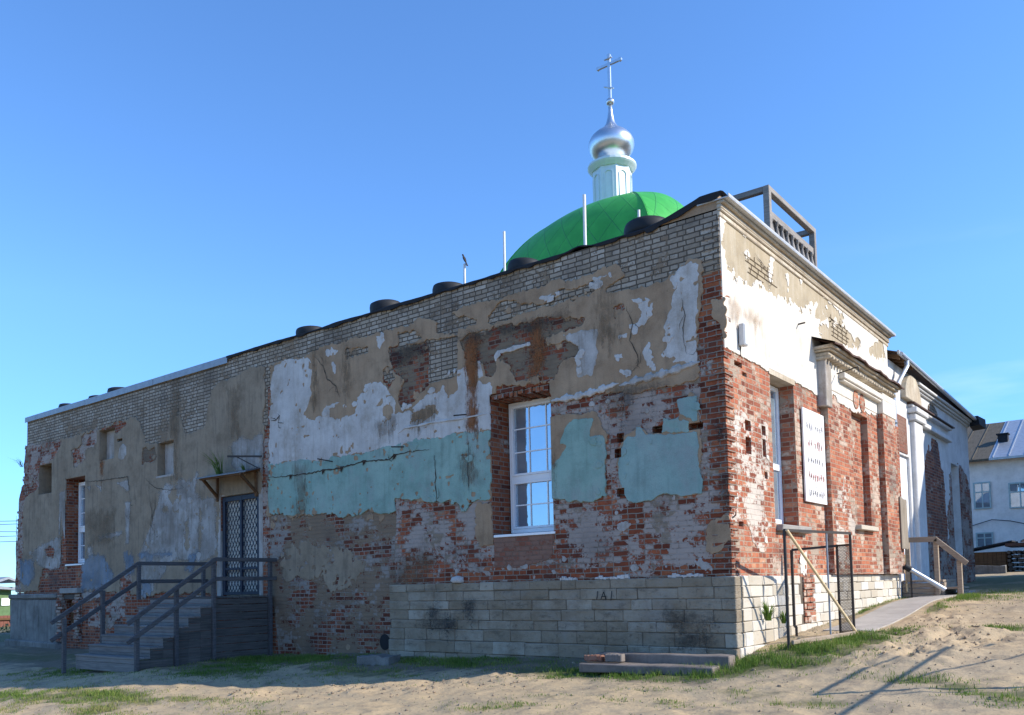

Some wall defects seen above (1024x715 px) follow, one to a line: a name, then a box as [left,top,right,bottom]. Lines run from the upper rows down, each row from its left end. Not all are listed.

crack [626,308,641,369]
peeling [721,222,885,360]
peeling [15,420,217,629]
crack [268,450,439,510]
flaking render [231,261,776,655]
peeling [799,552,807,576]
peeling [833,475,855,570]
flaking render [924,438,976,585]